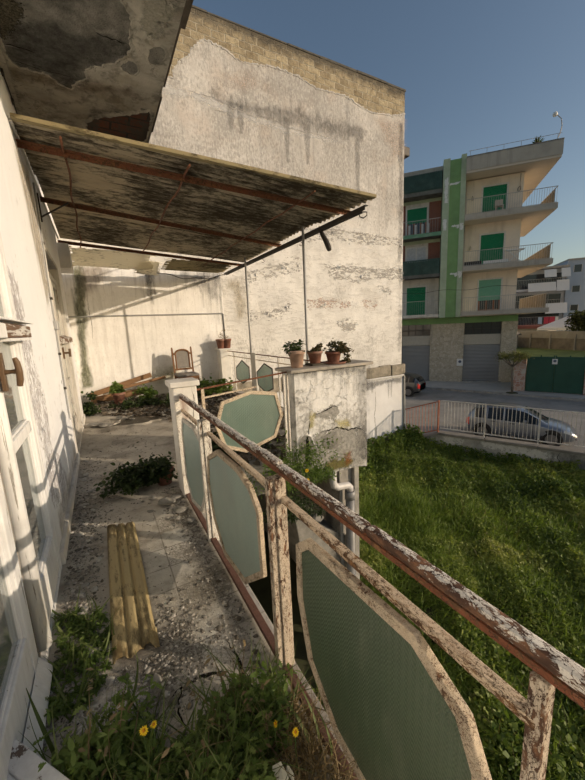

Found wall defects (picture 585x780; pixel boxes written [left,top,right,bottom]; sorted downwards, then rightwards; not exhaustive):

spalling [0,0,405,118]
spalling [81,108,154,143]
peeling [7,266,26,326]
leakage [74,267,99,387]
peeling [21,337,68,511]
spalling [297,405,400,469]
crack [172,640,252,726]